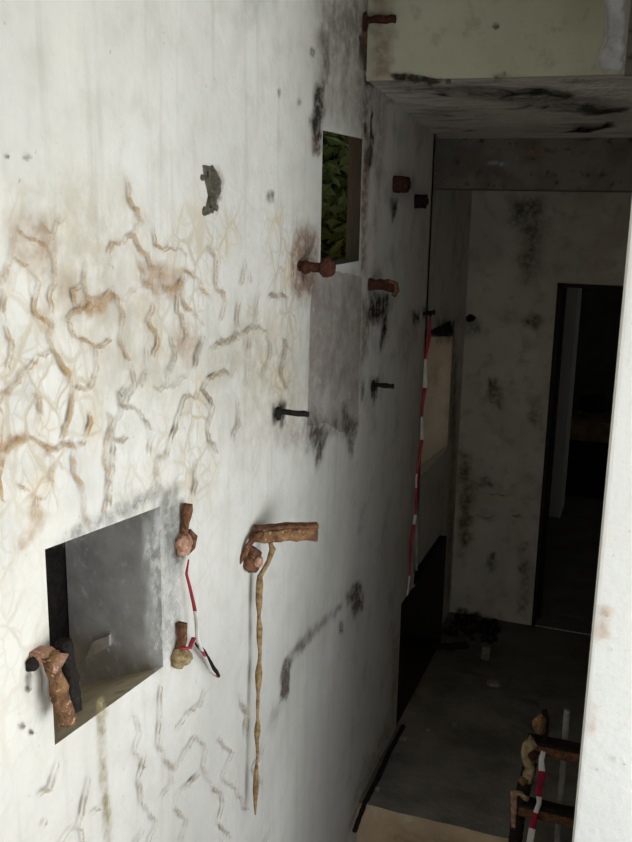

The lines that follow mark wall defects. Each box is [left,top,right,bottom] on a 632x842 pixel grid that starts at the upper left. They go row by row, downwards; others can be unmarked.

damp [312,86,324,152]
spalling [200,165,223,216]
damp [363,292,389,347]
crack [0,186,288,521]
crack [80,795,101,841]
crack [215,788,247,842]